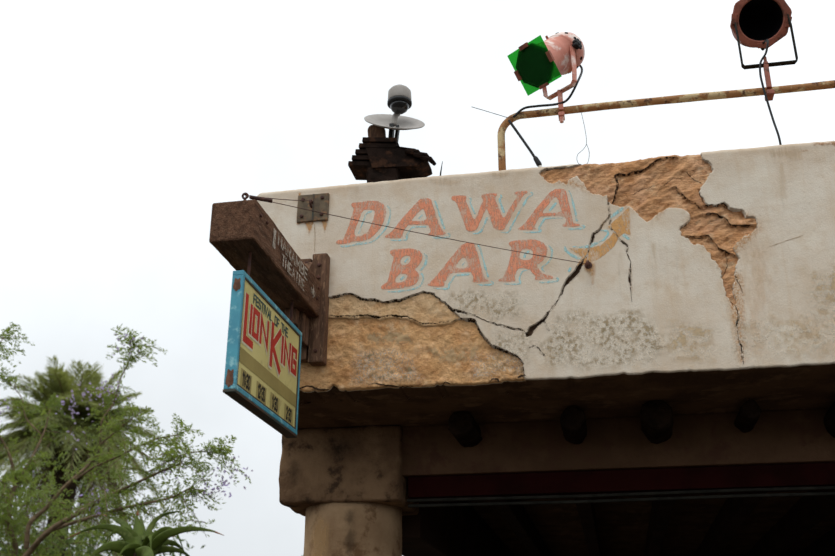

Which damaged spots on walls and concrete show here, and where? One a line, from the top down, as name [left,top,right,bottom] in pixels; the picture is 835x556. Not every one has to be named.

flaking render [299,292,525,392]
crack [331,201,632,382]
flaking render [540,155,757,306]
crack [730,276,744,364]